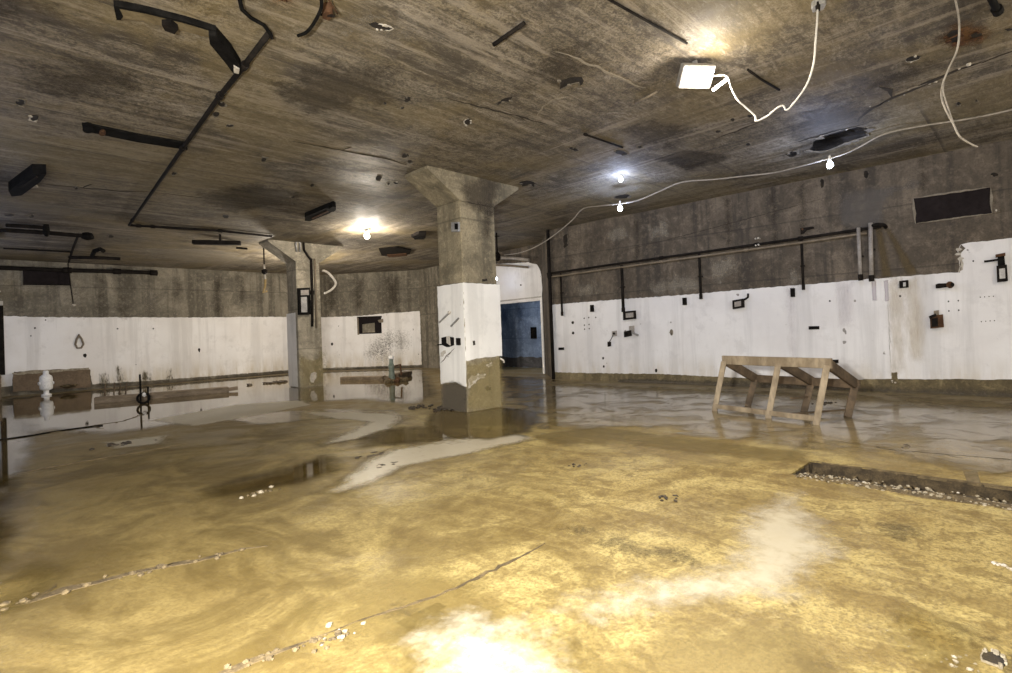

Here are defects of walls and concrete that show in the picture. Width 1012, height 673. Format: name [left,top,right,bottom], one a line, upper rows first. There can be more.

damp [279,63,384,115]
peeling [955,245,965,272]
crack [0,545,268,611]
crack [218,543,545,673]